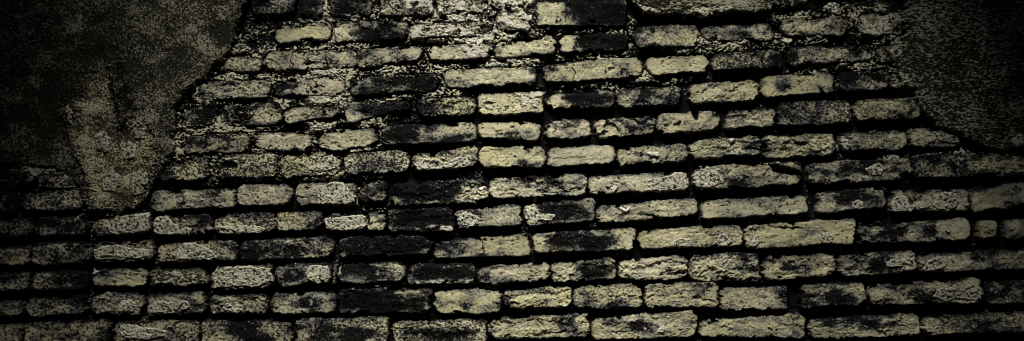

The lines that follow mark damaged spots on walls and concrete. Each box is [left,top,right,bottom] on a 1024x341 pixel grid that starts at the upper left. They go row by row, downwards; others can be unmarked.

spalling [859,14,903,58]
flaking render [94,119,150,196]
spalling [414,156,471,172]
spalling [308,155,368,231]
spalling [457,212,479,226]
spalling [525,197,555,226]
spalling [647,167,724,192]
spalling [888,191,959,212]
spalling [93,212,274,288]
spalling [305,265,333,284]
spalling [886,257,947,271]
spalling [117,299,190,340]